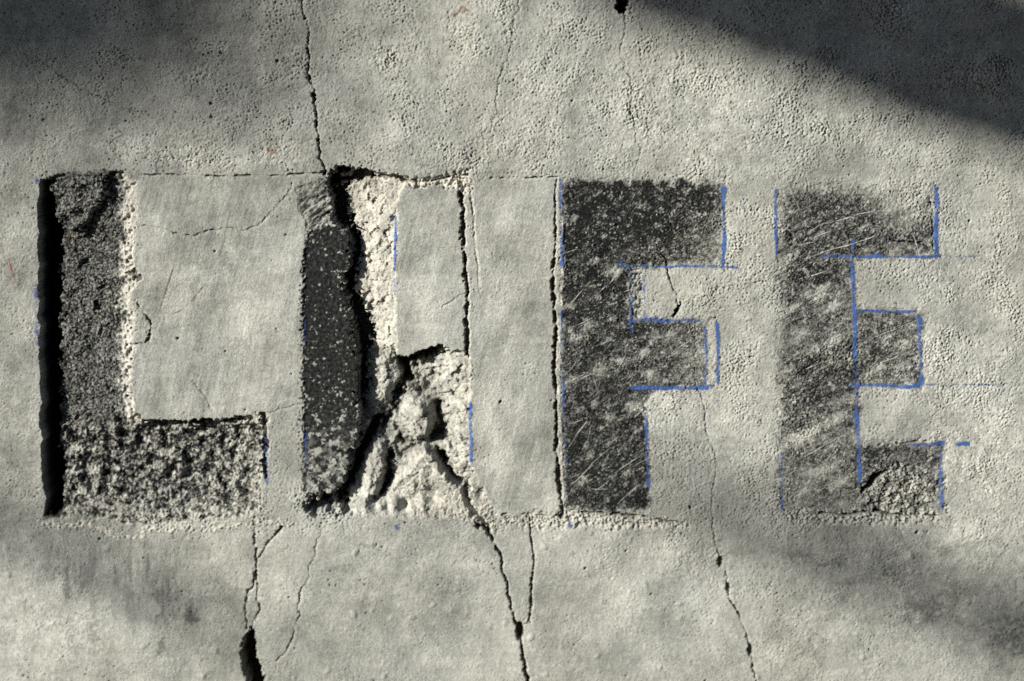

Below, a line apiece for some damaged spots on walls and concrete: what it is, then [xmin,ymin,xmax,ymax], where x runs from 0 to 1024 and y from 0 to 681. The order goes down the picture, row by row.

crack [301,0,327,178]
spalling [34,129,735,592]
crack [662,251,758,681]
crack [239,520,323,681]
crack [474,512,536,681]